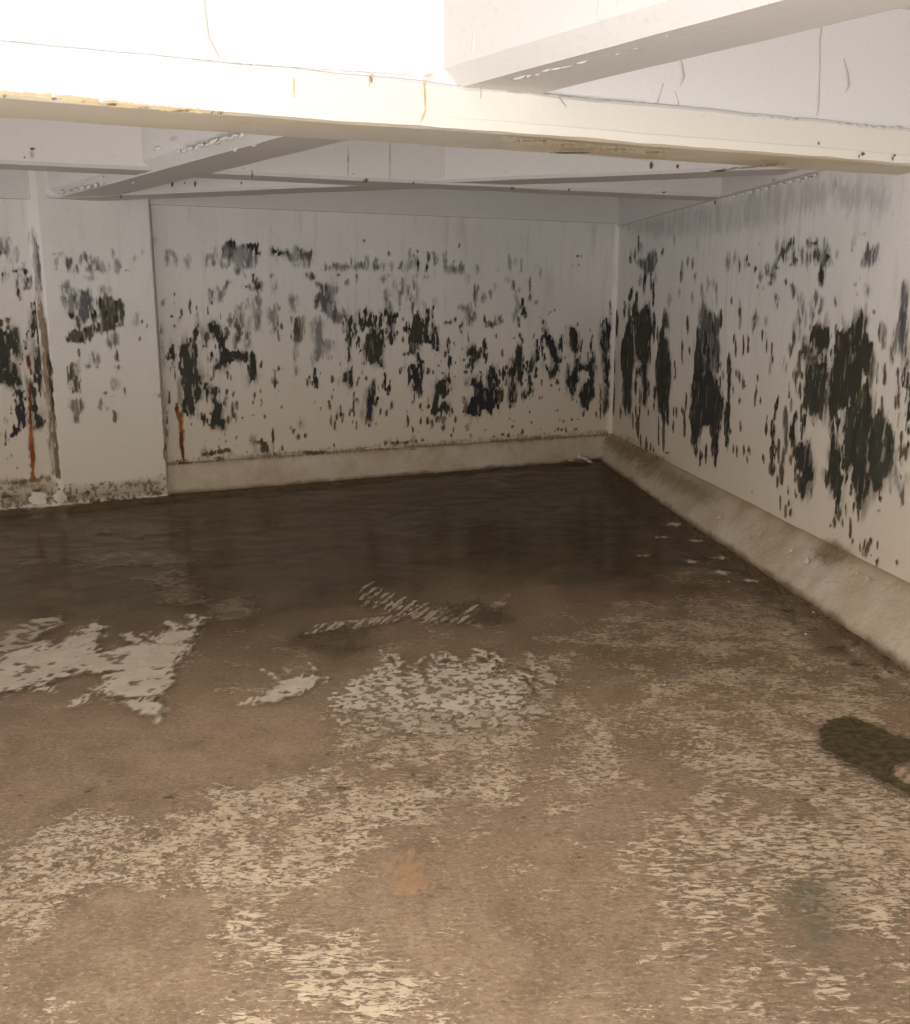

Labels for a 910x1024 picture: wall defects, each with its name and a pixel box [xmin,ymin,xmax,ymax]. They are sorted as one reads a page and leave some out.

damp [2,238,60,479]
damp [62,253,125,421]
damp [160,239,464,363]
damp [444,285,501,342]
damp [512,279,537,327]
damp [629,236,664,292]
damp [726,237,836,329]
damp [861,242,876,266]
corrosion [28,421,39,483]
corrosion [175,403,186,462]
damp [242,441,456,460]
damp [599,460,812,607]